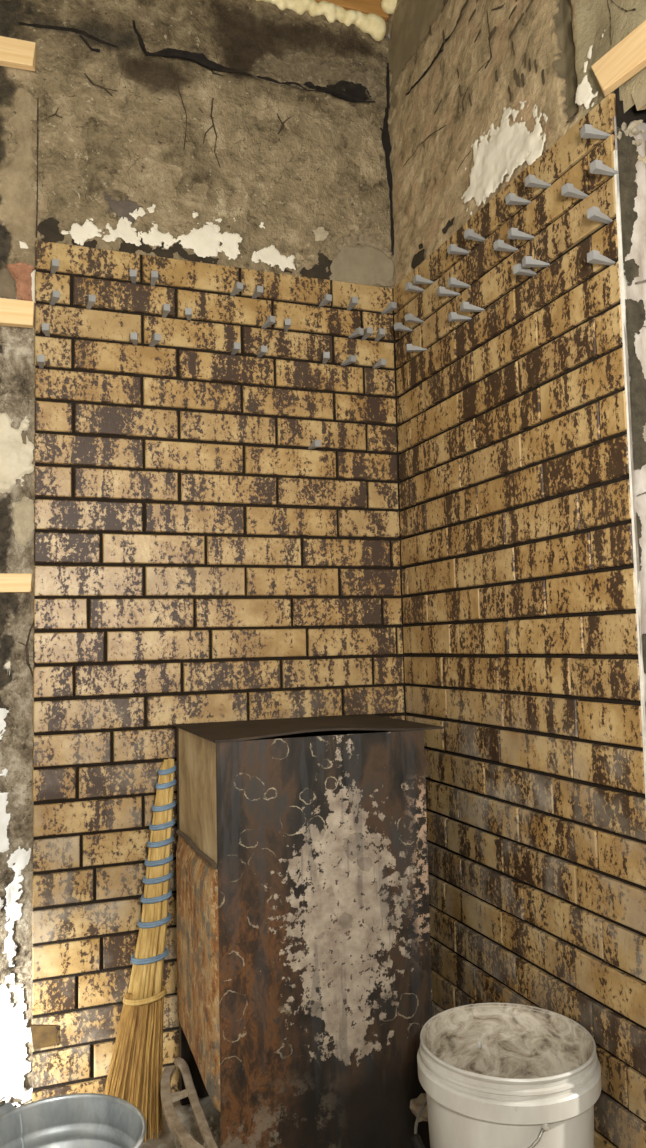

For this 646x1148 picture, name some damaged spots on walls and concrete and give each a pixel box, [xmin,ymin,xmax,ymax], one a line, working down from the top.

crack [18,3,505,256]
peeling [442,101,548,234]
leakage [0,224,11,269]
peeling [61,204,296,271]
flaking render [411,243,424,269]
leakage [0,494,12,570]
leakage [0,593,19,710]
peeling [0,708,9,740]
peeling [0,792,32,1108]